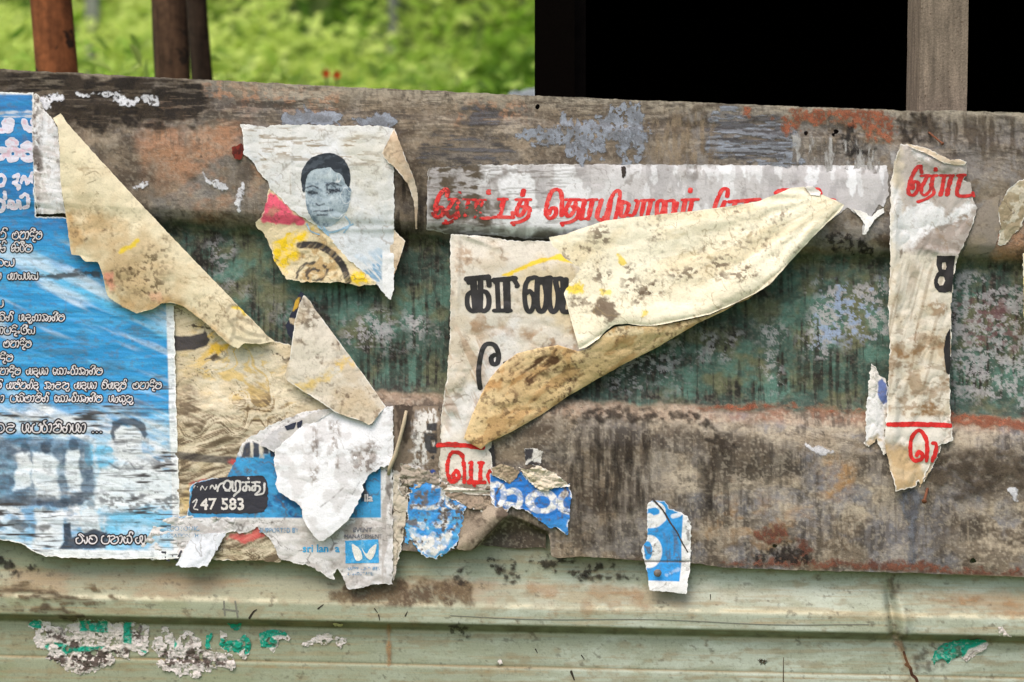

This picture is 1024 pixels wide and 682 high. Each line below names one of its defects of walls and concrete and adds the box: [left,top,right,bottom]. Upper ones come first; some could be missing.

peeling [40,91,159,110]
peeling [417,102,652,167]
rust [772,108,893,143]
leakage [573,405,735,453]
rust [950,412,1024,430]
leakage [570,440,649,510]
leakage [930,450,1024,502]
leakage [900,490,922,563]